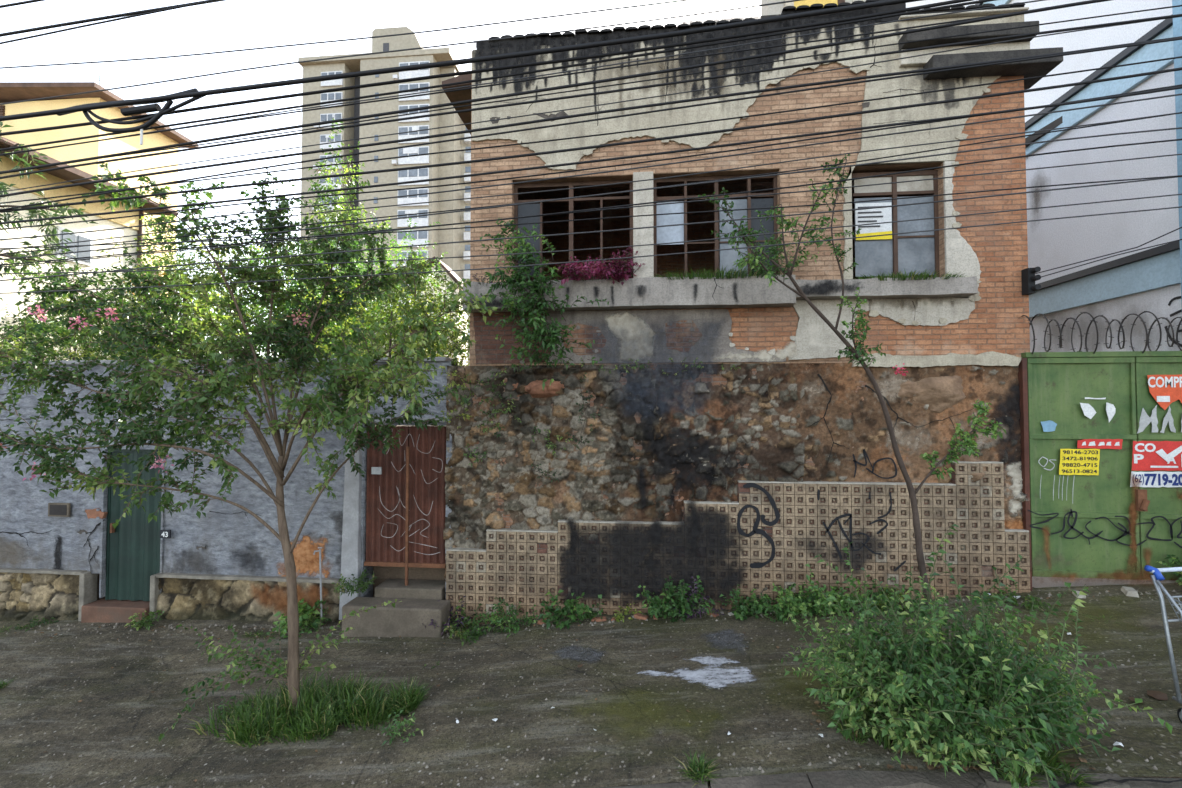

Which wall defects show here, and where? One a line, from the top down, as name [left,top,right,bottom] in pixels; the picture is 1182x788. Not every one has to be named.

leakage [473,7,876,115]
leakage [919,68,969,106]
spalling [470,59,870,283]
spalling [473,312,703,365]
spalling [720,307,798,362]
leakage [638,466,647,508]
peeling [278,531,334,578]
leakage [568,519,576,552]
corrosion [1099,478,1152,583]